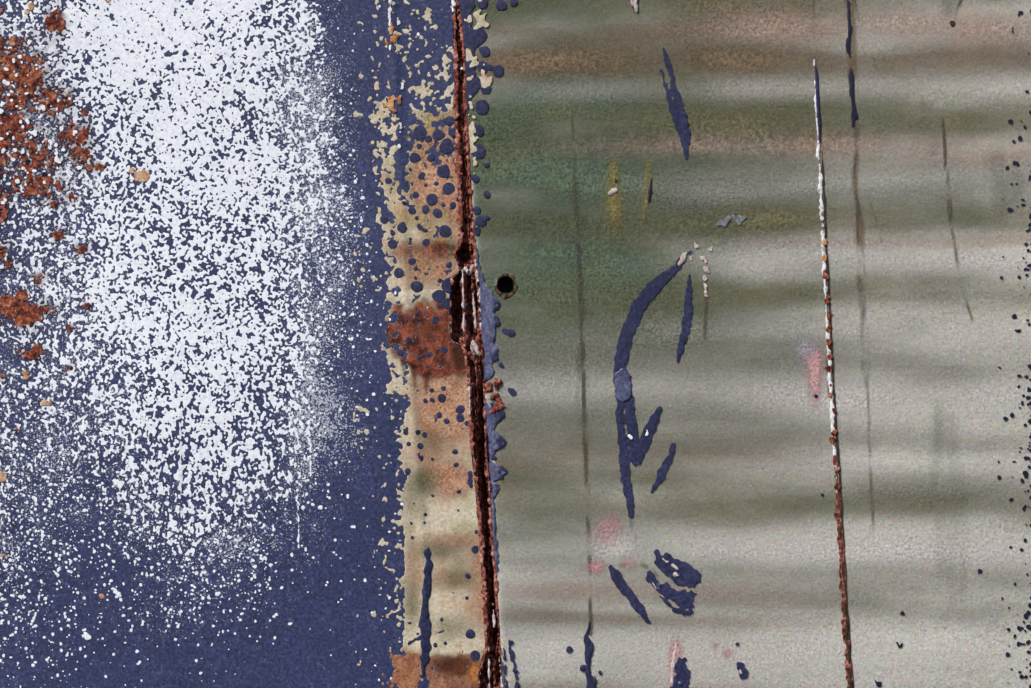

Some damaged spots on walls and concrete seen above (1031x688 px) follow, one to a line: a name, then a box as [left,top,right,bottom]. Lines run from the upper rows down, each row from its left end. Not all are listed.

corrosion [0,36,105,223]
corrosion [0,245,12,270]
corrosion [0,290,56,327]
peeling [0,0,507,688]
corrosion [382,0,503,688]